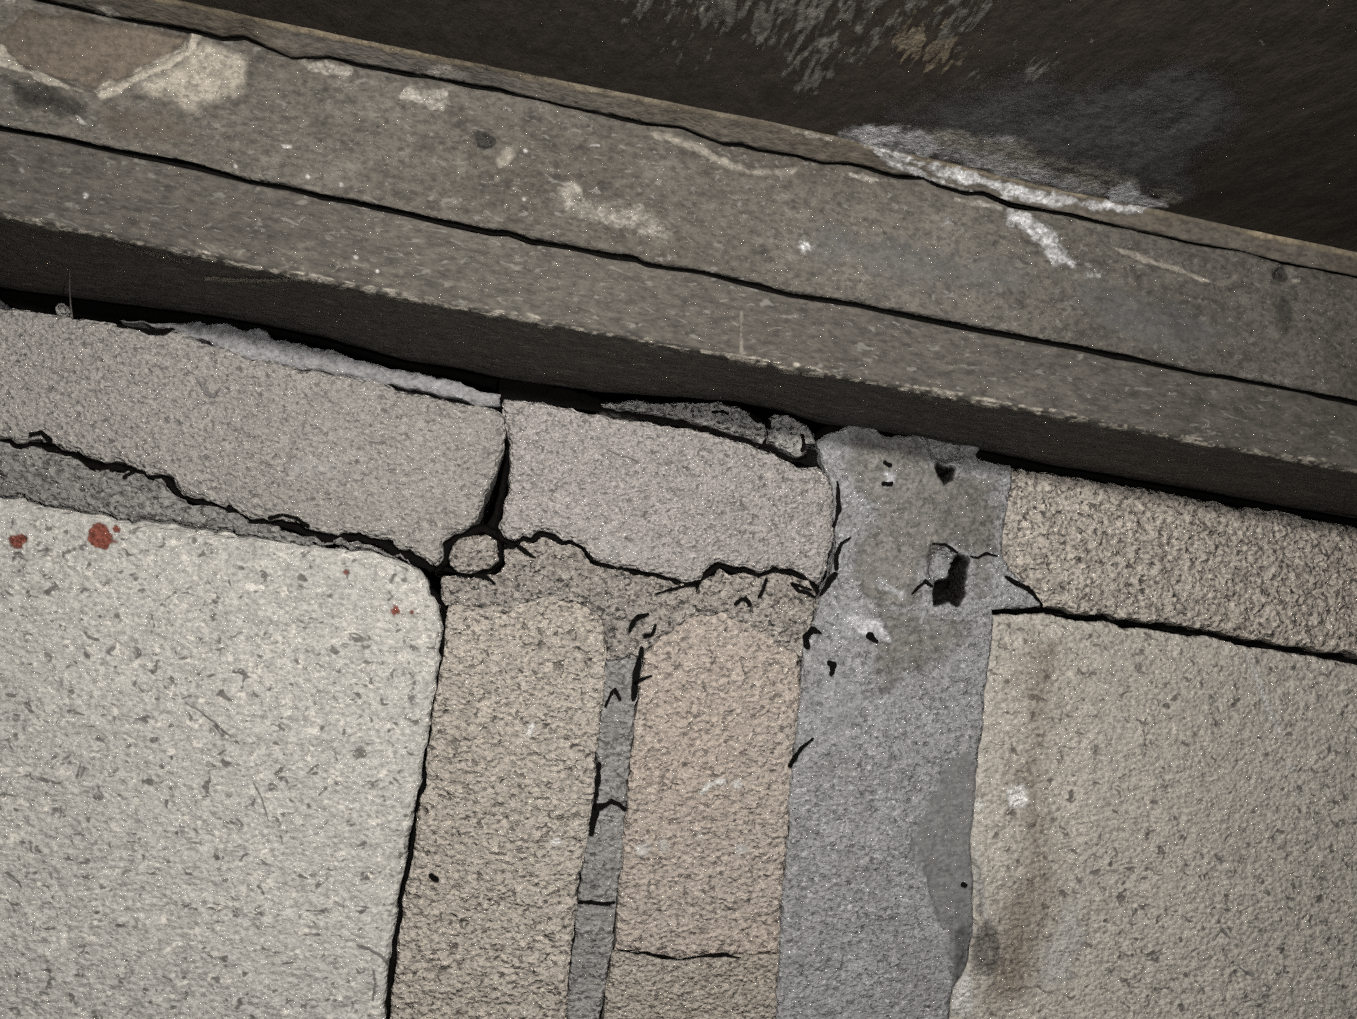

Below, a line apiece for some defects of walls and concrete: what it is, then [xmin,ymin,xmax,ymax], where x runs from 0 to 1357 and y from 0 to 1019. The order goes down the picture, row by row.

efflorescence [804,70,1234,267]
crack [0,126,1357,406]
spalling [935,462,955,484]
crack [0,288,851,1019]
crack [912,579,933,594]
hole [932,554,970,607]
crack [932,543,1357,665]